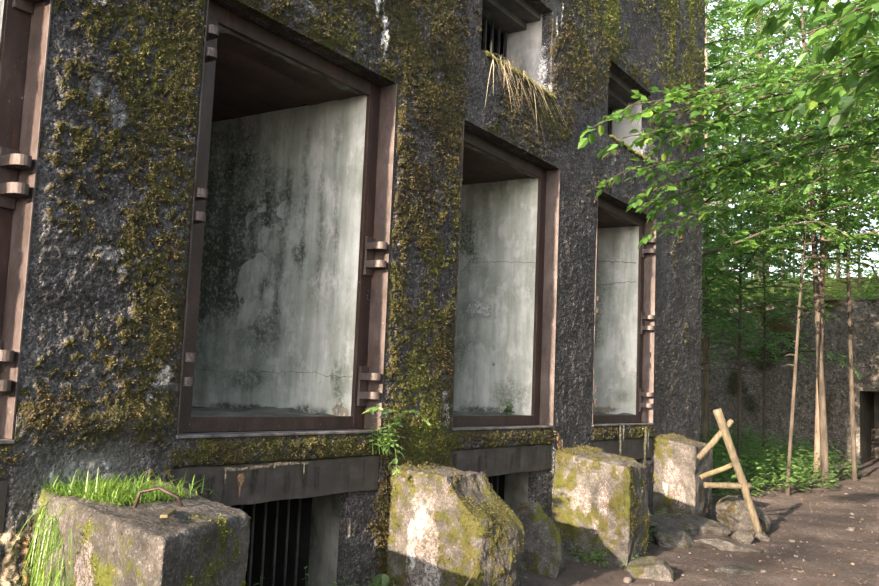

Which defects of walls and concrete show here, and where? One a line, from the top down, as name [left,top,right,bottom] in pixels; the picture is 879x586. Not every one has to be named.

efflorescence [375,0,389,55]